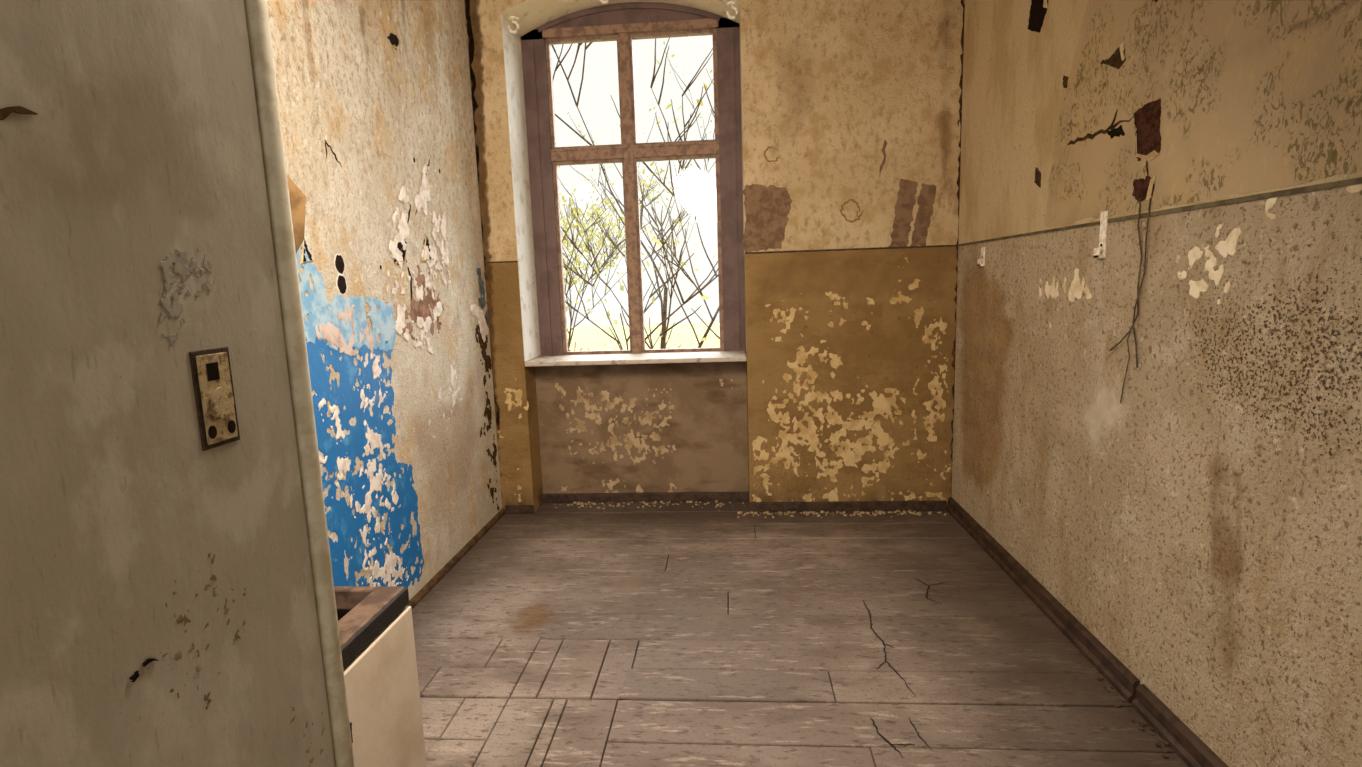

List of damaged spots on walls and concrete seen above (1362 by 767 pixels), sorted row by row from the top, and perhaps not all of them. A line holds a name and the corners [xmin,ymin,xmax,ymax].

flaking render [742,184,792,252]
peeling [1265,197,1278,220]
peeling [1347,184,1362,193]
peeling [1176,223,1242,304]
peeling [296,164,465,590]
peeling [752,179,951,502]
peeling [555,383,678,465]
peeling [602,478,644,493]